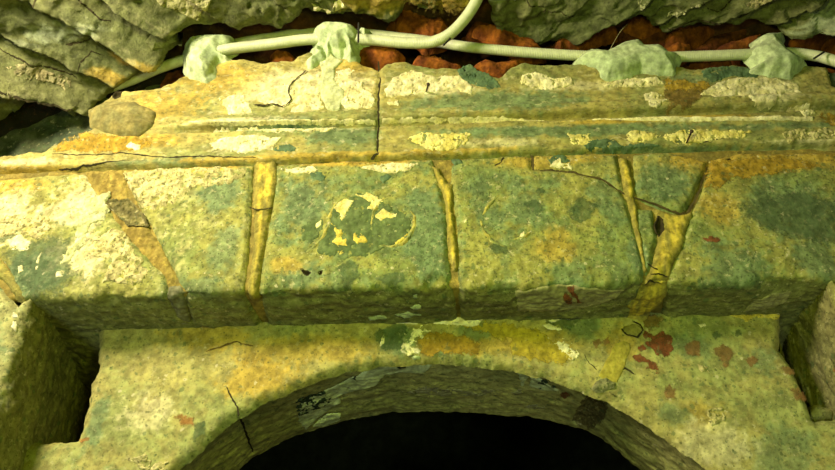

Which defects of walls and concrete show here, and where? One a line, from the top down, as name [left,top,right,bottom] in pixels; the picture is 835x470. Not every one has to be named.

crack [254,70,306,107]
peeling [189,64,544,165]
crack [371,61,381,160]
peeling [567,66,816,154]
crack [52,152,256,171]
crack [530,155,708,215]
peeling [301,192,411,291]
damp [744,192,835,247]
peeling [434,317,483,327]
rust [563,285,582,305]
rust [633,314,674,374]
rust [715,344,733,367]